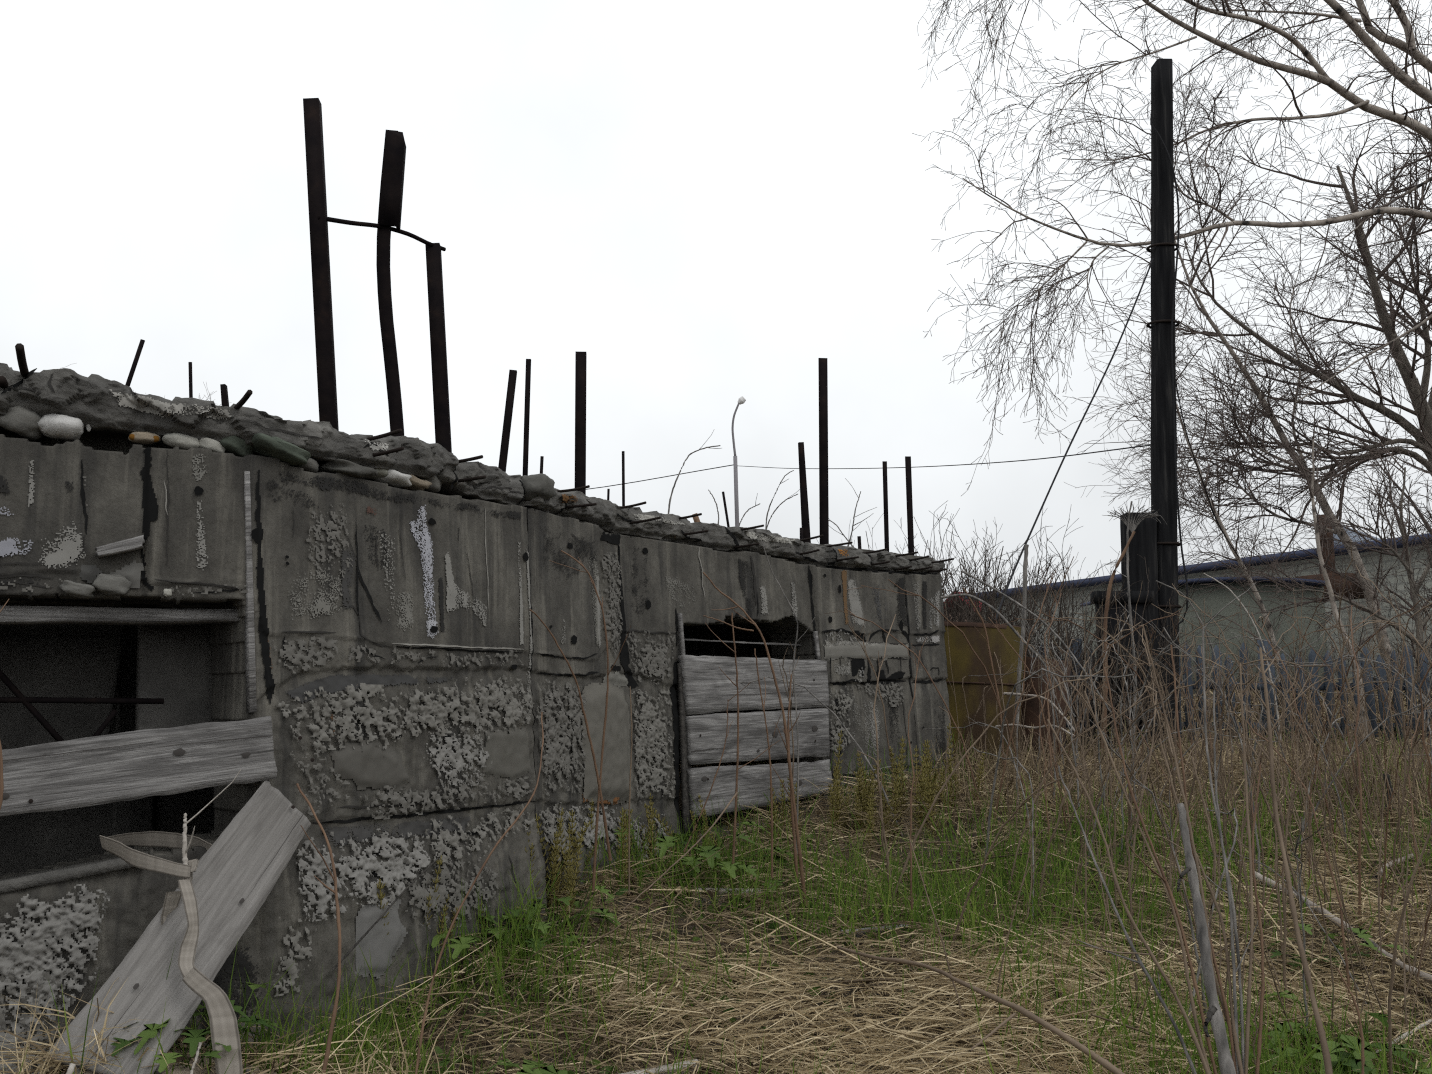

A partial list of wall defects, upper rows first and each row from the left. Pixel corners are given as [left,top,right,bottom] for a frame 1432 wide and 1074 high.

water stain [266,471,522,639]
spalling [272,552,676,997]
spalling [0,884,112,1074]